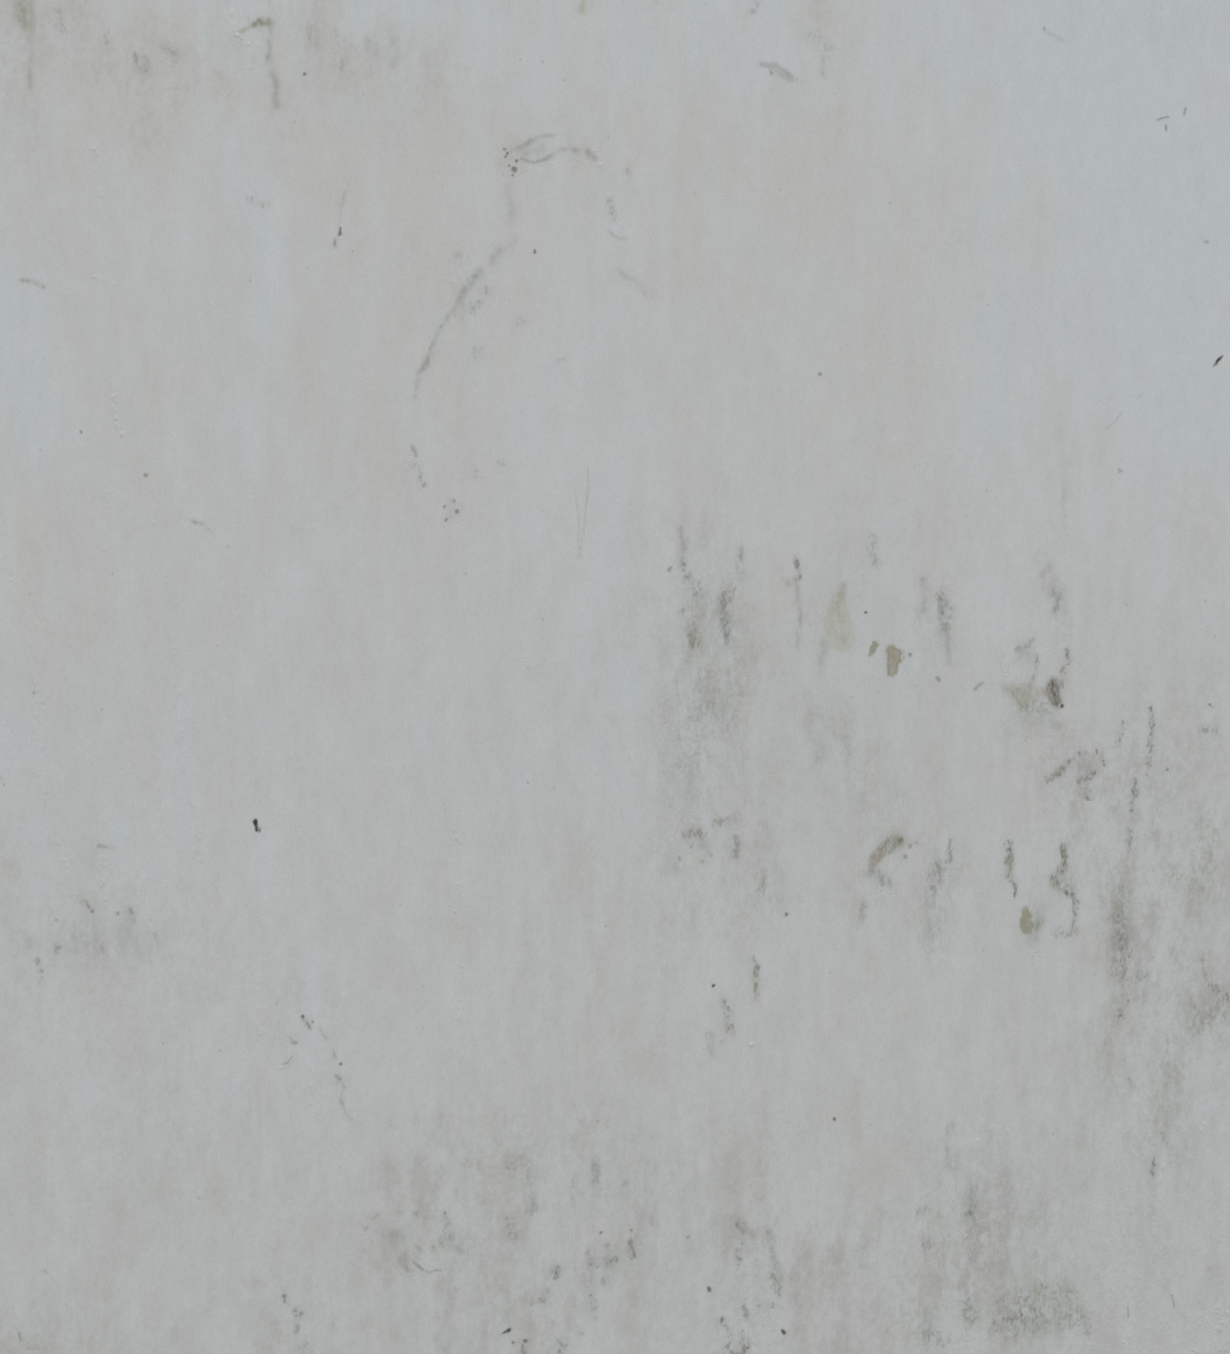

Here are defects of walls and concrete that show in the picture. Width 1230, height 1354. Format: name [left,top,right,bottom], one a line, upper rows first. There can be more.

water stain [782,552,907,680]
water stain [913,569,959,672]
water stain [1033,557,1070,620]
water stain [657,522,756,876]
water stain [997,629,1128,801]
water stain [700,953,765,1060]
water stain [853,823,957,953]
water stain [1000,702,1230,1185]